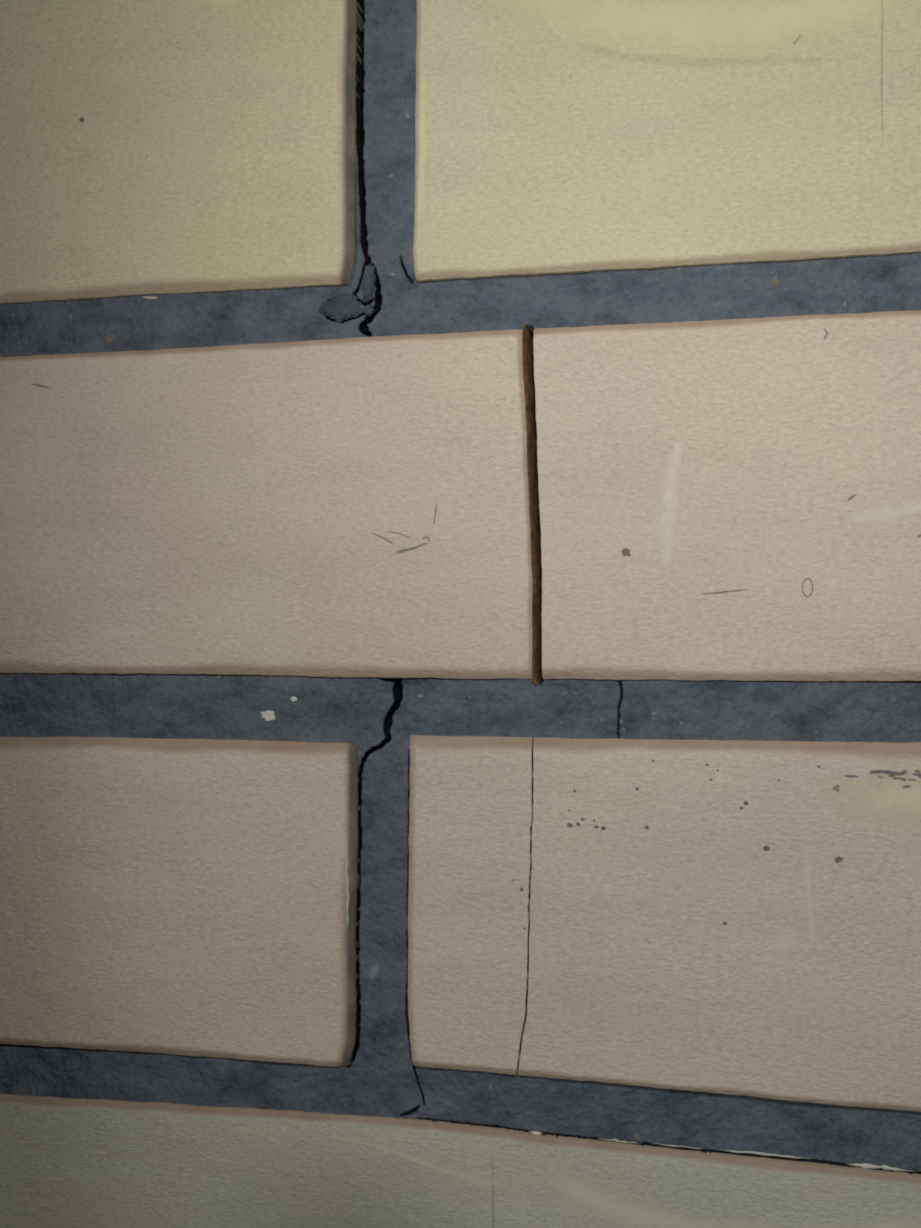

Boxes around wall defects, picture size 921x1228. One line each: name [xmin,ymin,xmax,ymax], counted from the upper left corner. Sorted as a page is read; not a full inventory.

spalling [319,263,376,322]
crack [326,0,413,337]
crack [522,324,544,684]
crack [348,679,921,1176]